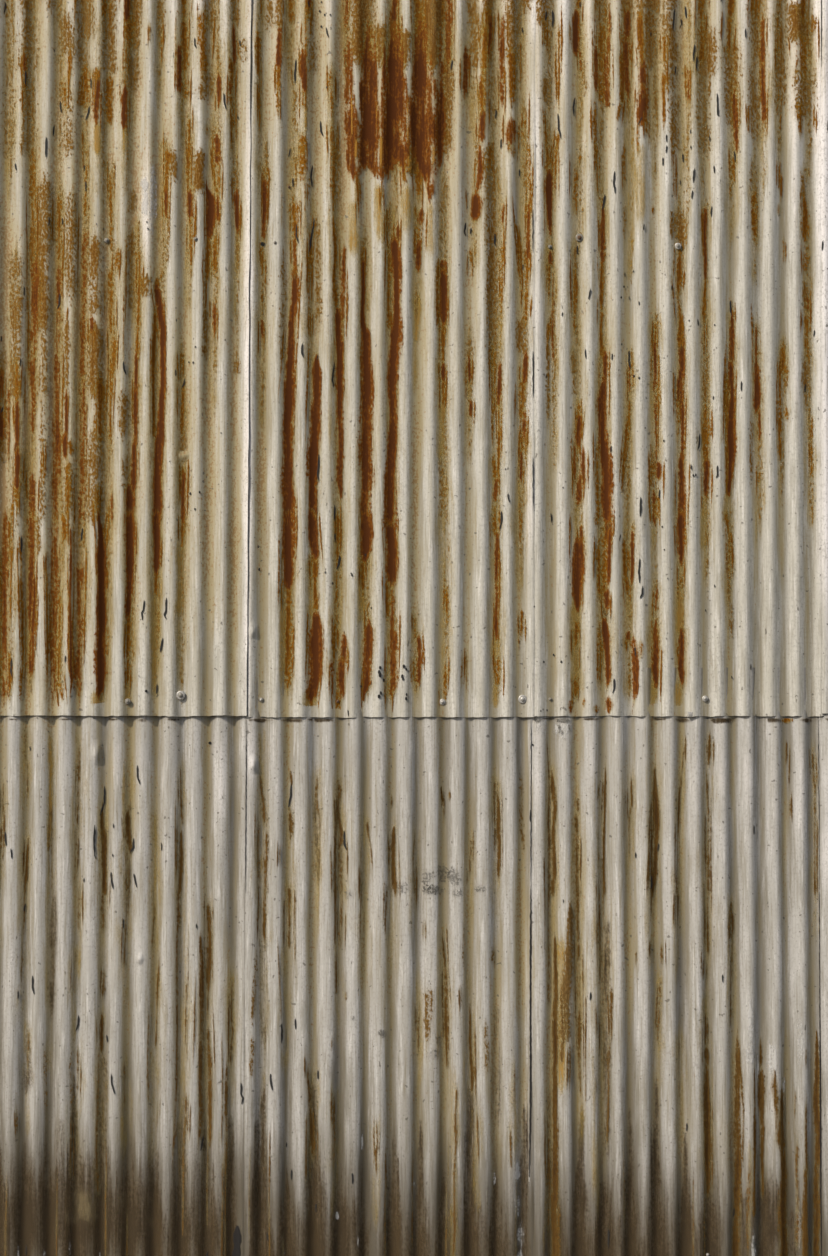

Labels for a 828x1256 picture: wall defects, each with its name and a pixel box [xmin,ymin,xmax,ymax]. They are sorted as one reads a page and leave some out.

corrosion [0,0,820,714]
leakage [0,1080,235,1256]
leakage [249,1090,528,1256]
leakage [543,1031,821,1256]